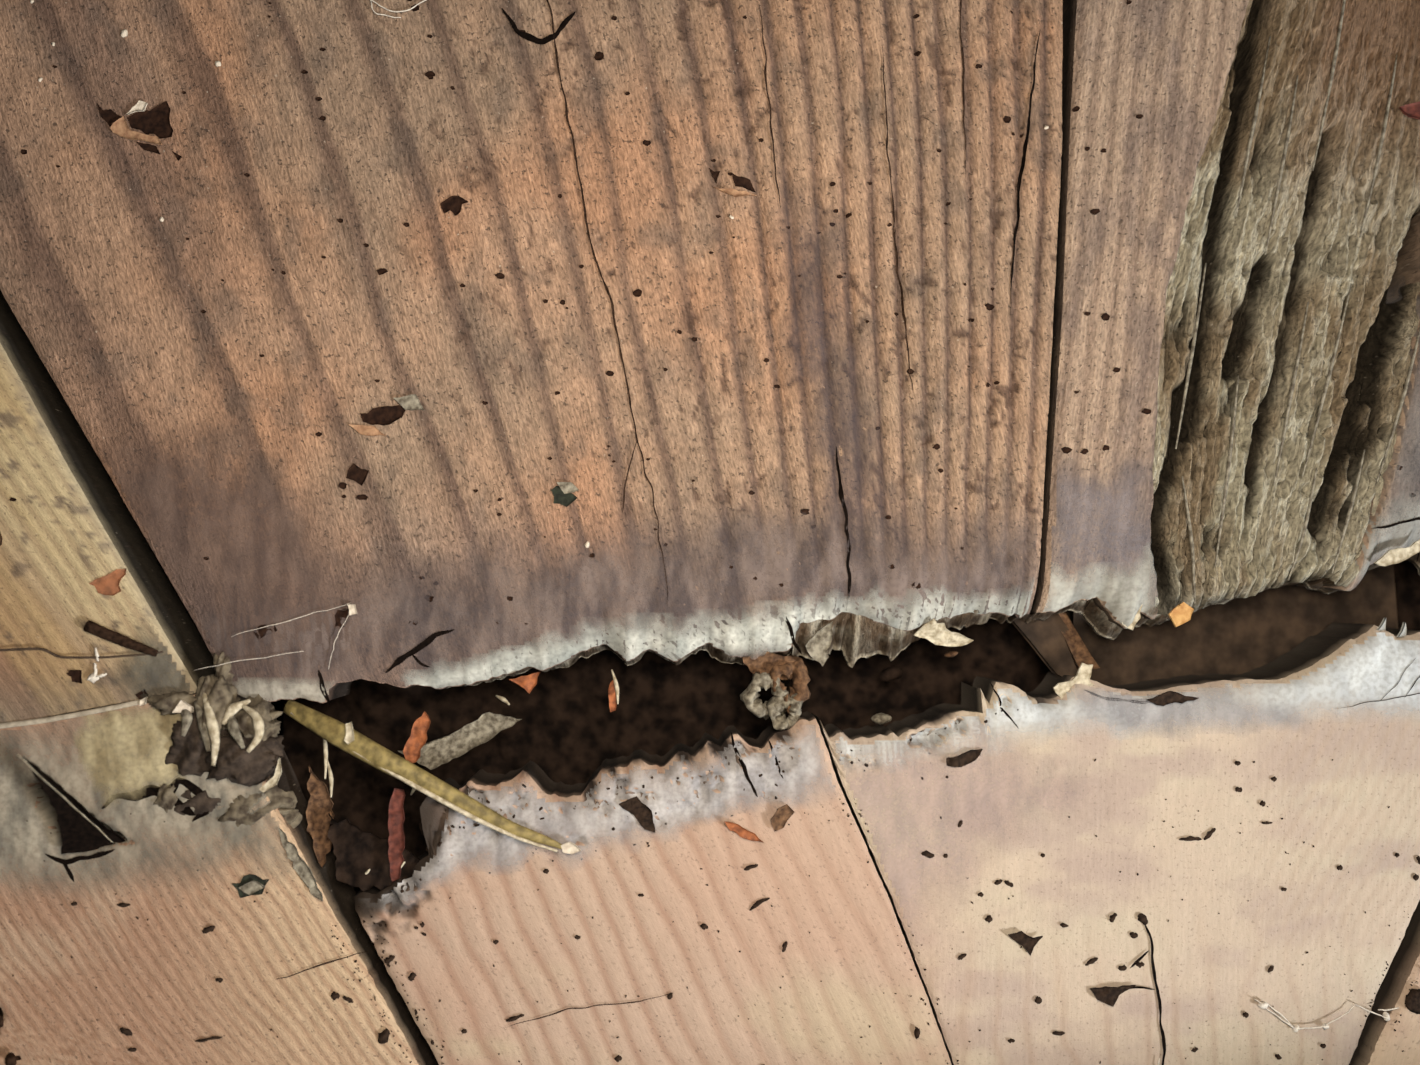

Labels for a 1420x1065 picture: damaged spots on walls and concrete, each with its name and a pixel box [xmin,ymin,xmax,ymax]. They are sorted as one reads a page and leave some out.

crack [546,0,668,606]
peeling [1374,539,1420,566]
peeling [335,604,357,628]
peeling [805,621,833,666]
peeling [914,618,974,647]
peeling [1121,604,1143,630]
peeling [1053,663,1094,700]
water stain [0,736,269,881]
peeling [278,765,429,901]
water stain [232,874,270,898]